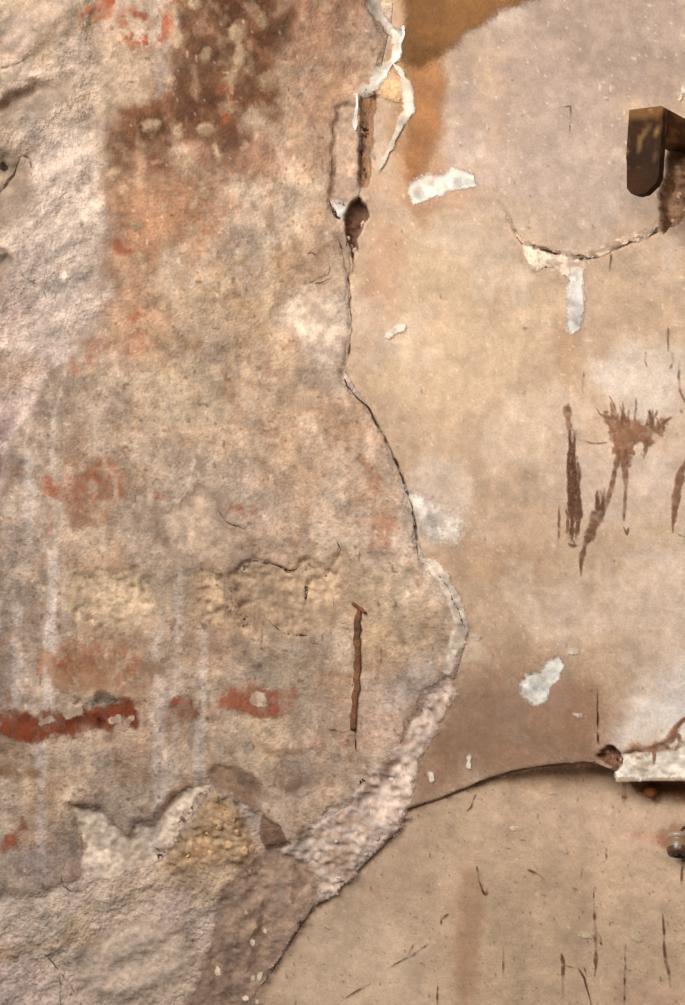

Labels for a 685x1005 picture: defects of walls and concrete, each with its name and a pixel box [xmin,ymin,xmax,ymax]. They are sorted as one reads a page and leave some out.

spalling [329,0,415,256]
spalling [408,168,477,205]
damp [401,0,525,180]
spalling [272,283,350,374]
crack [307,201,419,560]
spalling [155,482,349,639]
corrosion [557,396,673,576]
corrosion [671,462,685,532]
peeling [67,558,477,1005]
crack [408,694,599,811]
spalling [598,722,685,781]
corrosion [625,716,685,764]